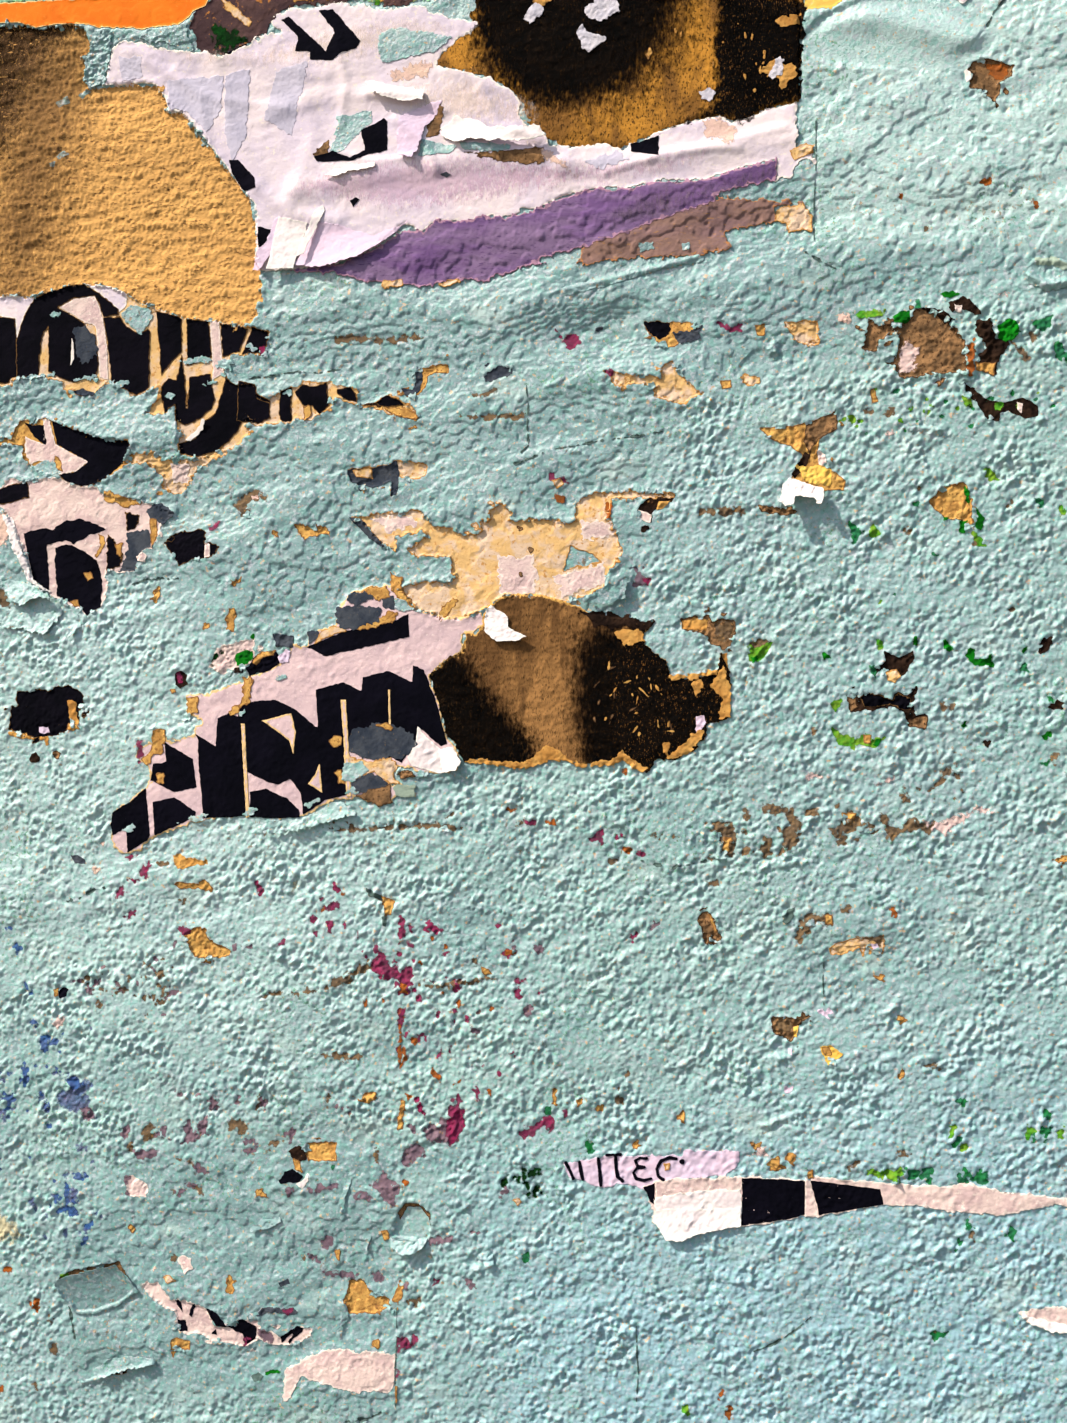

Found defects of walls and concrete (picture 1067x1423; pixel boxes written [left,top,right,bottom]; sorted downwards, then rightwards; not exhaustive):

spalling [0,0,263,332]
spalling [603,320,766,405]
spalling [838,290,1067,424]
peeling [131,447,228,495]
peeling [164,521,220,566]
spalling [347,457,675,622]
peeling [0,580,86,641]
peeling [170,671,188,694]
peeling [209,634,263,677]
spalling [680,607,773,667]
peeling [811,636,956,751]
peeling [263,801,356,835]